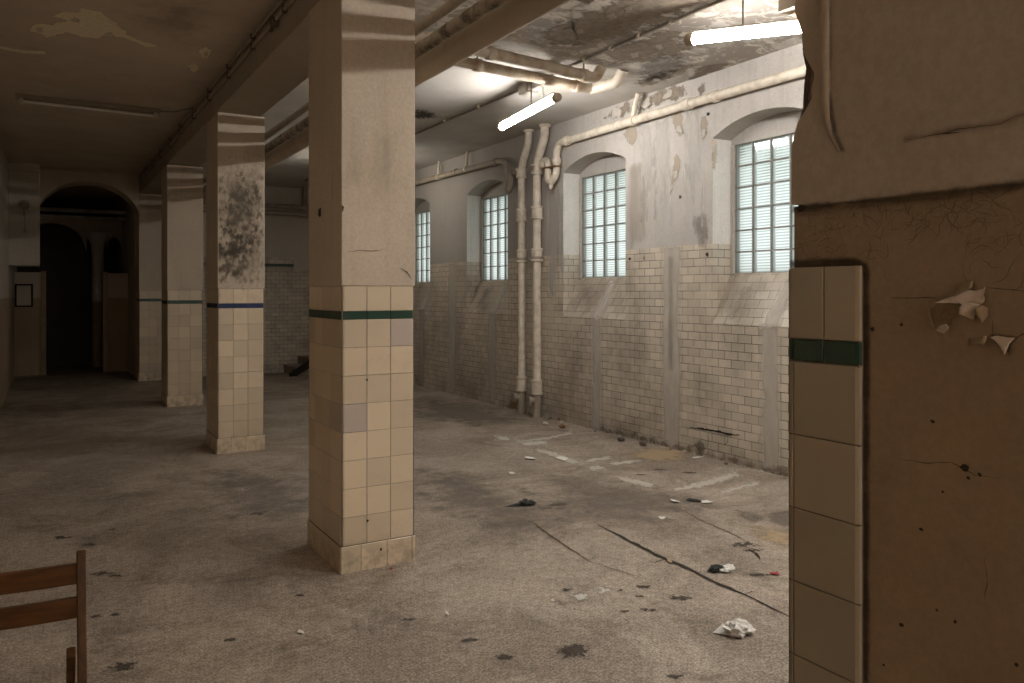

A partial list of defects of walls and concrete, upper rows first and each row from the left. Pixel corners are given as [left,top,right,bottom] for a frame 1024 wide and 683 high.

peeling [29,8,161,47]
peeling [543,0,701,145]
crack [909,114,1022,140]
leakage [219,173,261,282]
crack [790,188,1024,291]
peeling [916,281,1024,355]
crack [690,427,739,445]
crack [528,520,789,617]